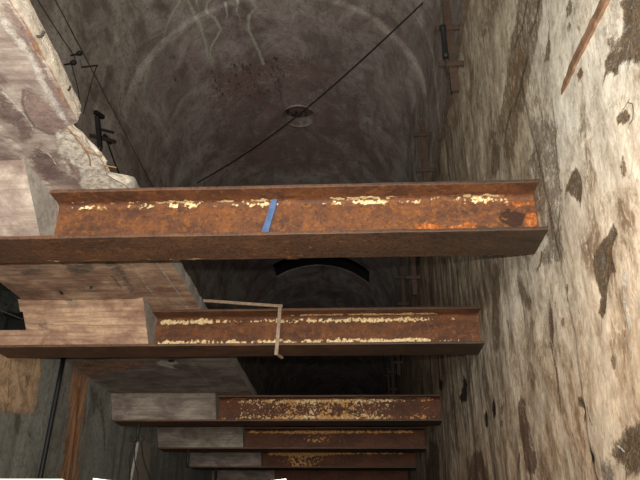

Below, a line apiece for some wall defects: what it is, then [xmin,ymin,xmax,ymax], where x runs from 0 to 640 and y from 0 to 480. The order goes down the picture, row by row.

spalling [602,0,640,86]
spalling [565,168,582,207]
peeling [128,200,203,209]
peeling [215,198,278,208]
peeling [323,196,421,205]
peeling [457,194,508,204]
rust [499,201,537,227]
rust [415,221,477,229]
spalling [593,225,618,330]
peeling [250,312,436,323]
spalling [590,423,640,480]